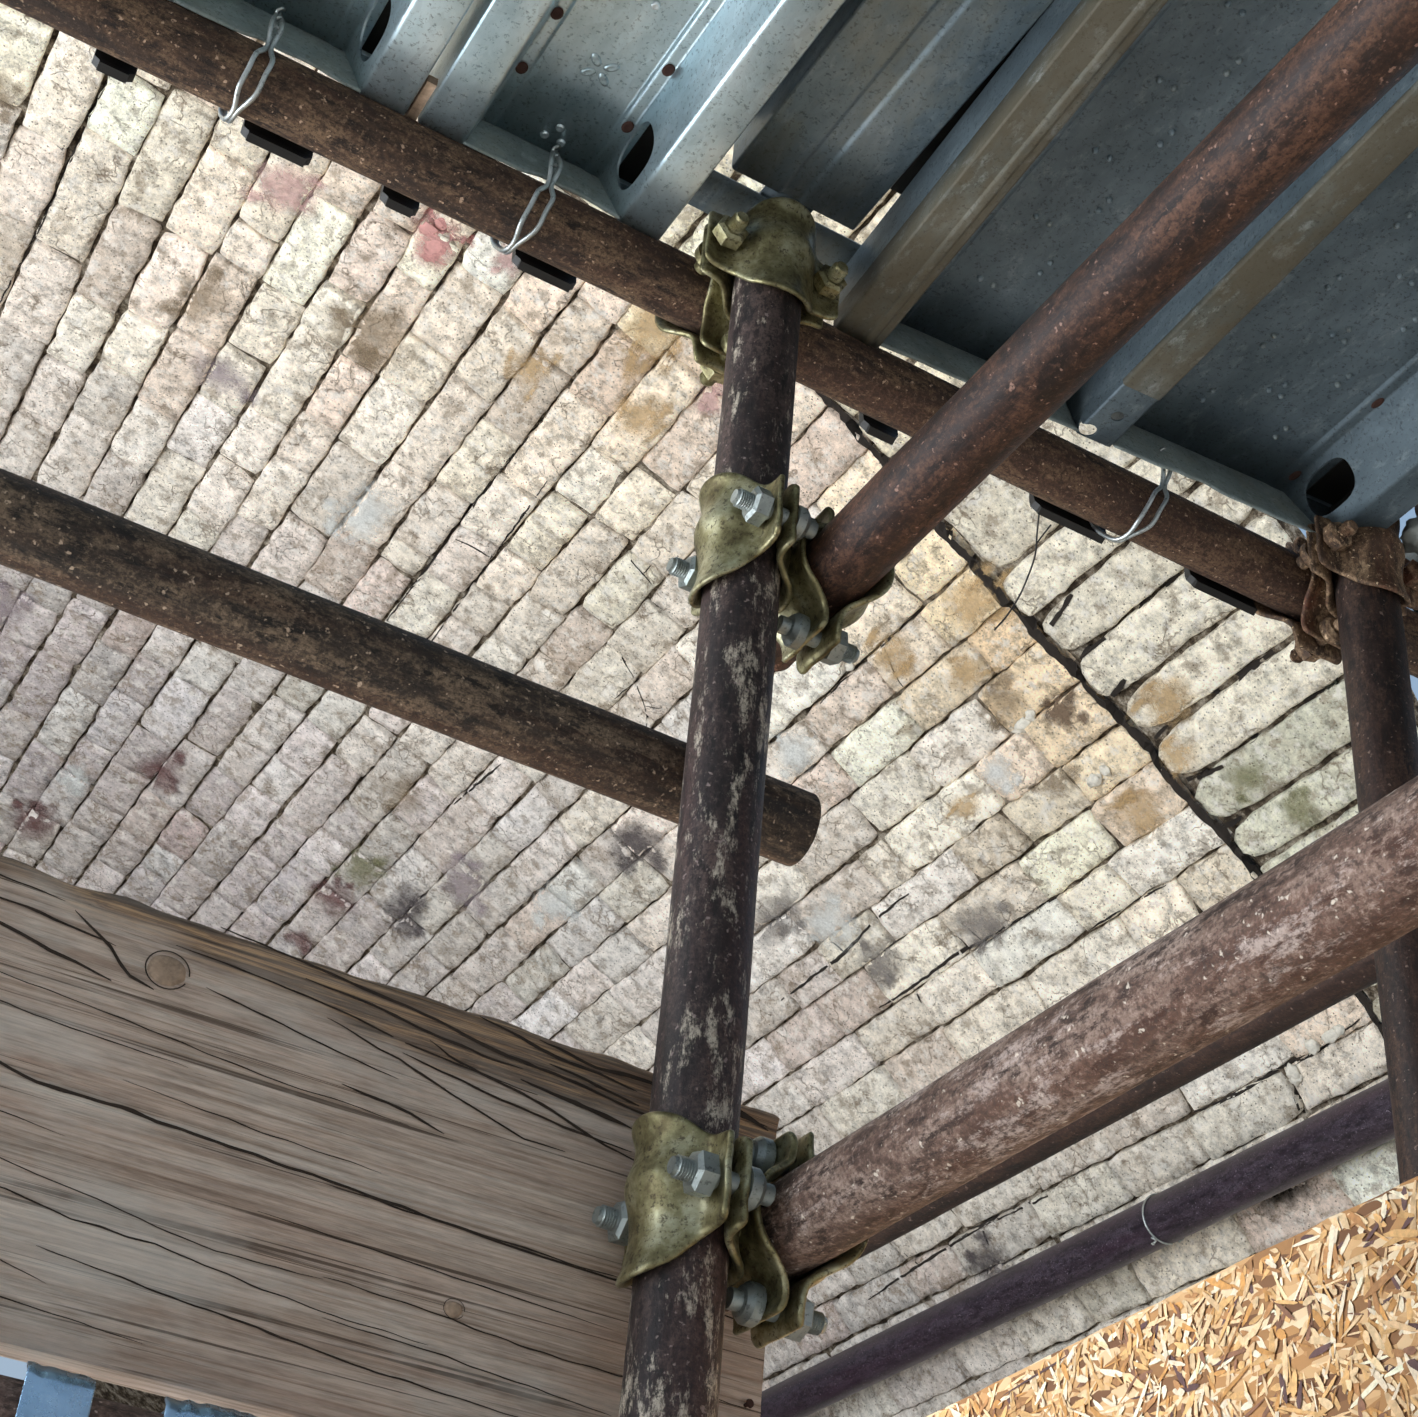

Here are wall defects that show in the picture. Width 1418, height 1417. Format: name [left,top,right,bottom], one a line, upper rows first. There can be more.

crack [815,391,889,467]
crack [934,522,1262,880]
leakage [143,750,185,791]
leakage [13,799,55,836]